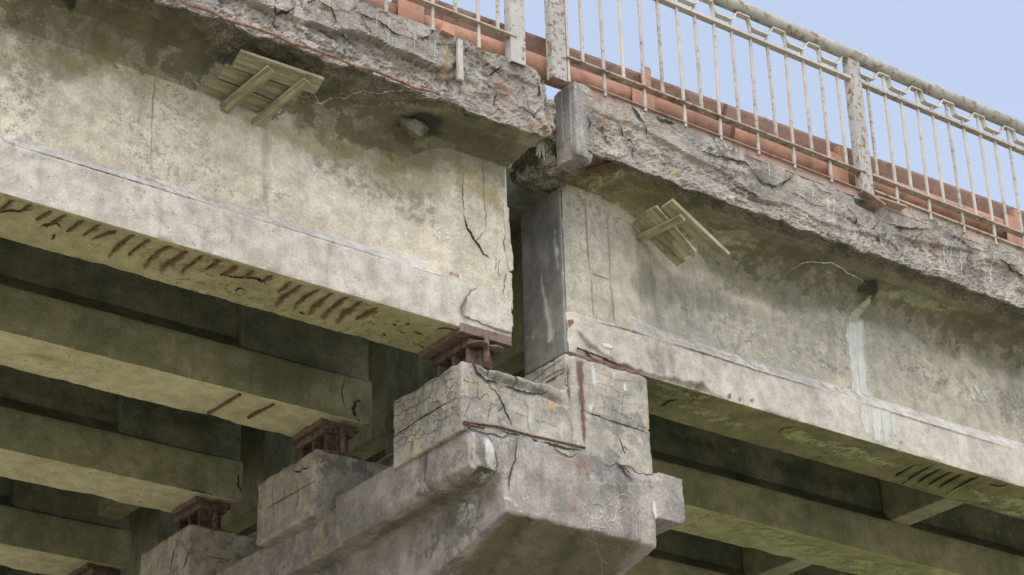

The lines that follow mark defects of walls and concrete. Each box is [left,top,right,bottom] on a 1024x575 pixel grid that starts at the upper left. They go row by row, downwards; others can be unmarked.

spalling [184,2,441,96]
corrosion [42,211,253,277]
crack [0,79,447,278]
corrosion [275,284,377,323]
crack [462,161,506,293]
crack [585,200,831,393]
crack [694,146,1024,277]
crack [393,359,581,486]
corrosion [546,361,586,443]
crack [576,368,654,538]
leakage [845,297,896,442]
crack [860,402,1012,449]